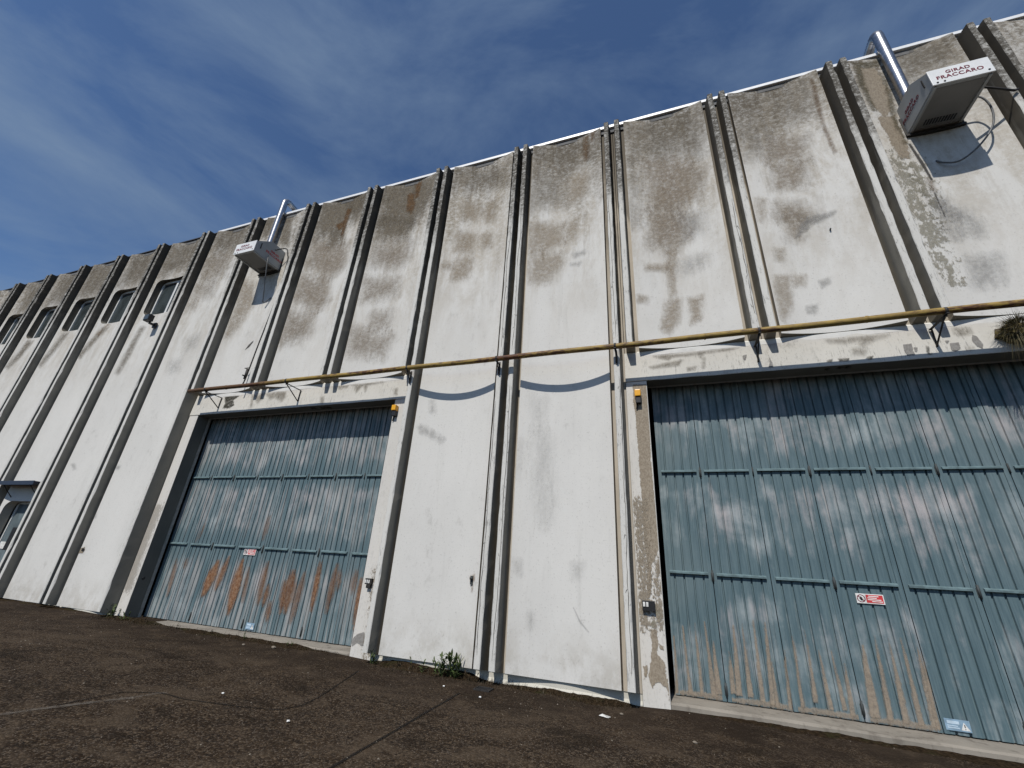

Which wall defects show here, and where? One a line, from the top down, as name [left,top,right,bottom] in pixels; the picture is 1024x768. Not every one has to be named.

water stain [297,195,365,305]
water stain [377,176,435,261]
water stain [647,161,702,330]
peeling [858,68,967,287]
rust [202,557,247,614]
rust [258,564,336,619]
rust [353,580,362,625]
peeling [633,384,941,731]